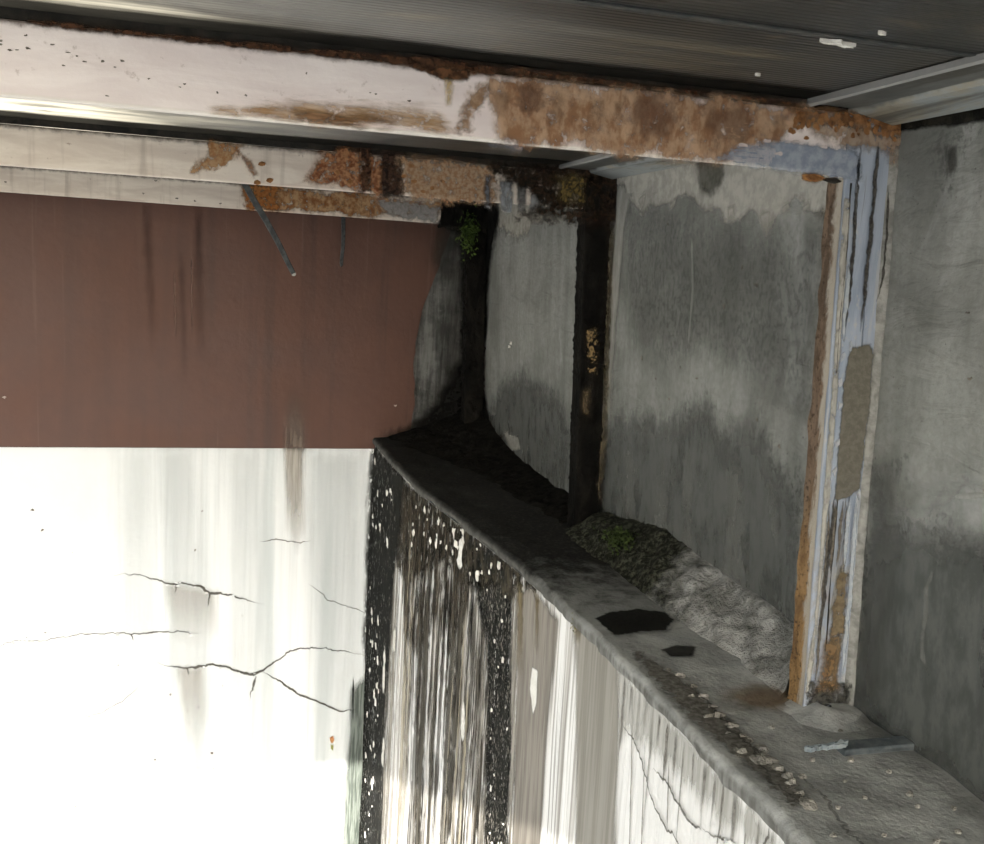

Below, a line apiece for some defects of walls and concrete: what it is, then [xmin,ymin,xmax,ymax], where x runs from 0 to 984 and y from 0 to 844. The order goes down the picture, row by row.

corrosion [26,20,901,164]
corrosion [191,139,496,223]
leakage [285,420,304,510]
leakage [406,161,794,621]
corrosion [737,173,849,707]
crack [0,630,193,647]
crack [119,573,252,605]
crack [164,647,351,712]
leakage [807,480,984,800]
crack [624,728,735,844]